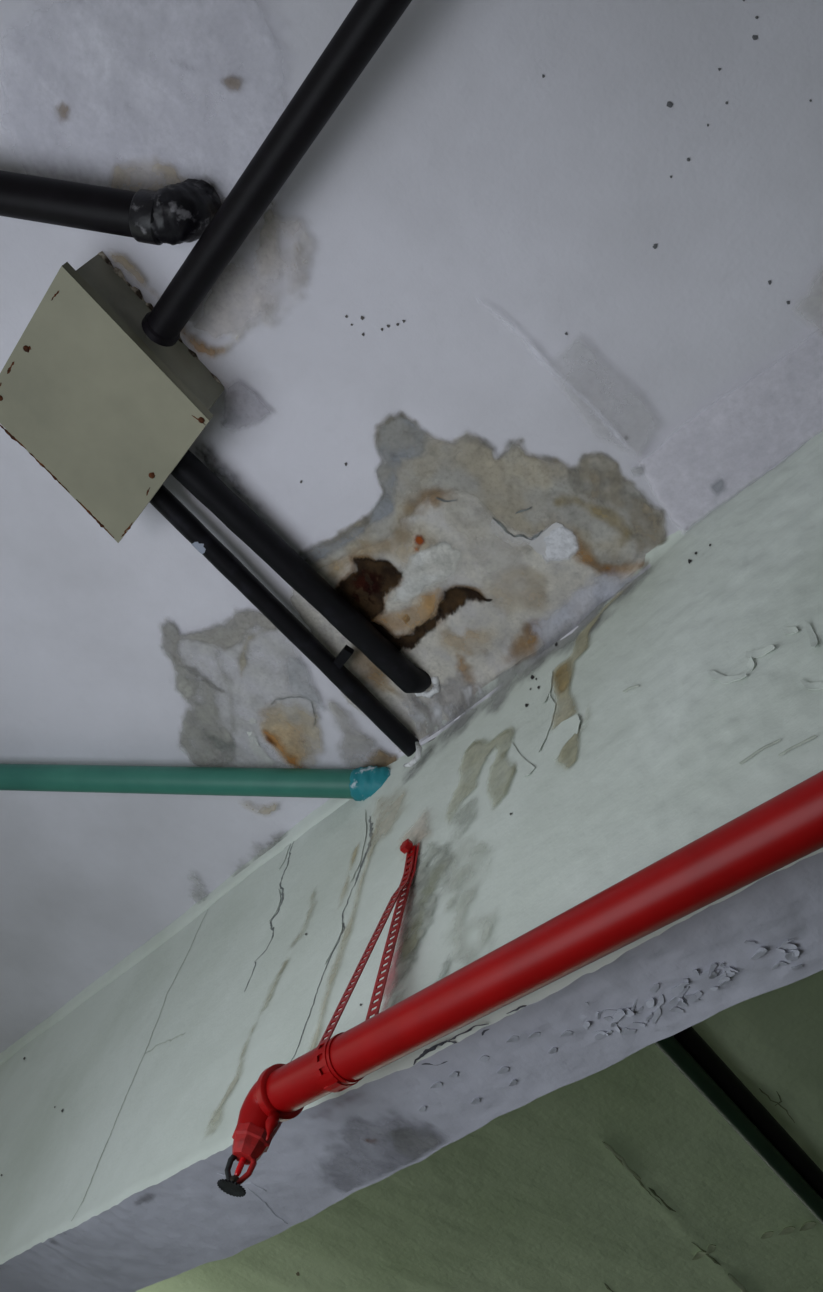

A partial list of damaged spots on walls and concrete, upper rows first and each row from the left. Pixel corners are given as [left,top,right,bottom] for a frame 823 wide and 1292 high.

water stain [162,417,664,777]
spalling [337,557,492,650]
peeling [490,519,566,561]
corrosion [264,715,304,768]
water stain [448,730,514,825]
peeling [508,671,581,776]
crack [244,843,293,992]
crack [290,810,373,1062]
water stain [384,814,479,1010]
crack [71,910,208,1221]